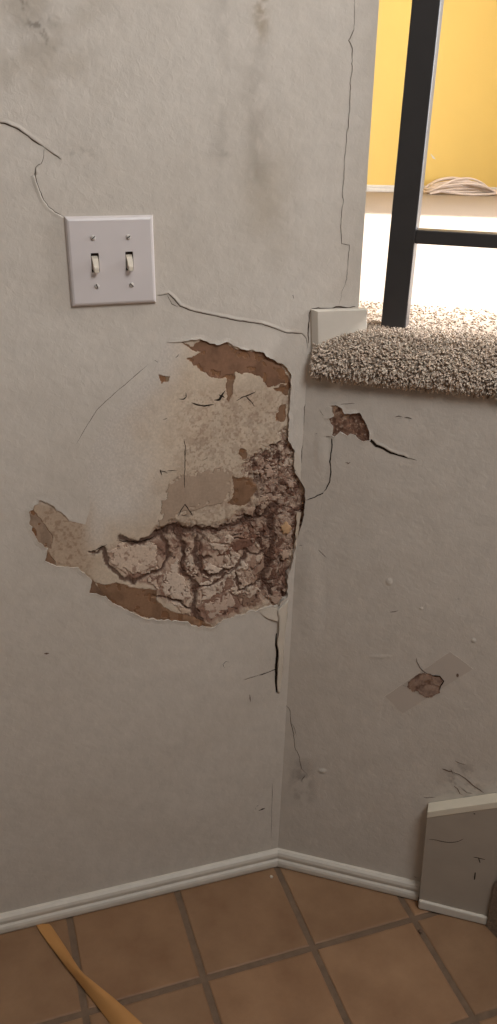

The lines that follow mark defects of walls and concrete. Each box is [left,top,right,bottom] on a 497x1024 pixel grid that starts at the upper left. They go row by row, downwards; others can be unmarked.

crack [0,118,63,220]
crack [157,0,355,348]
flaking render [24,334,415,693]
peeling [403,658,444,698]